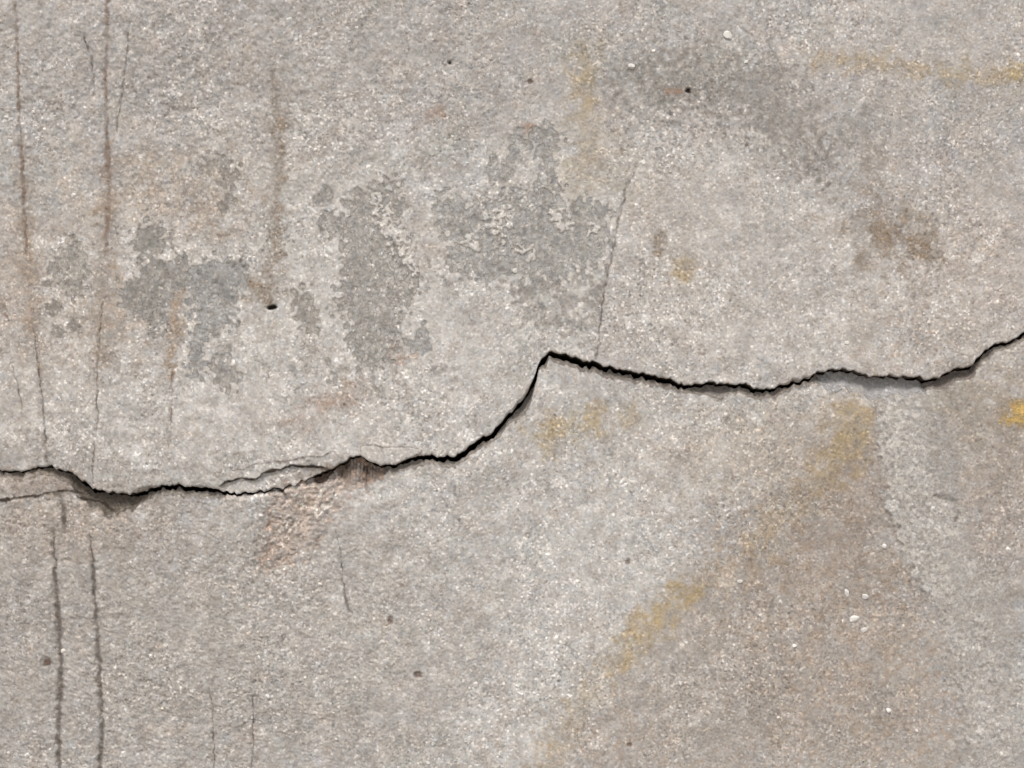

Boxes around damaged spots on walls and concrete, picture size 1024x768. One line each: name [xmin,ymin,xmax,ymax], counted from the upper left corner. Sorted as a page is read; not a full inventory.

crack [0,332,1024,518]